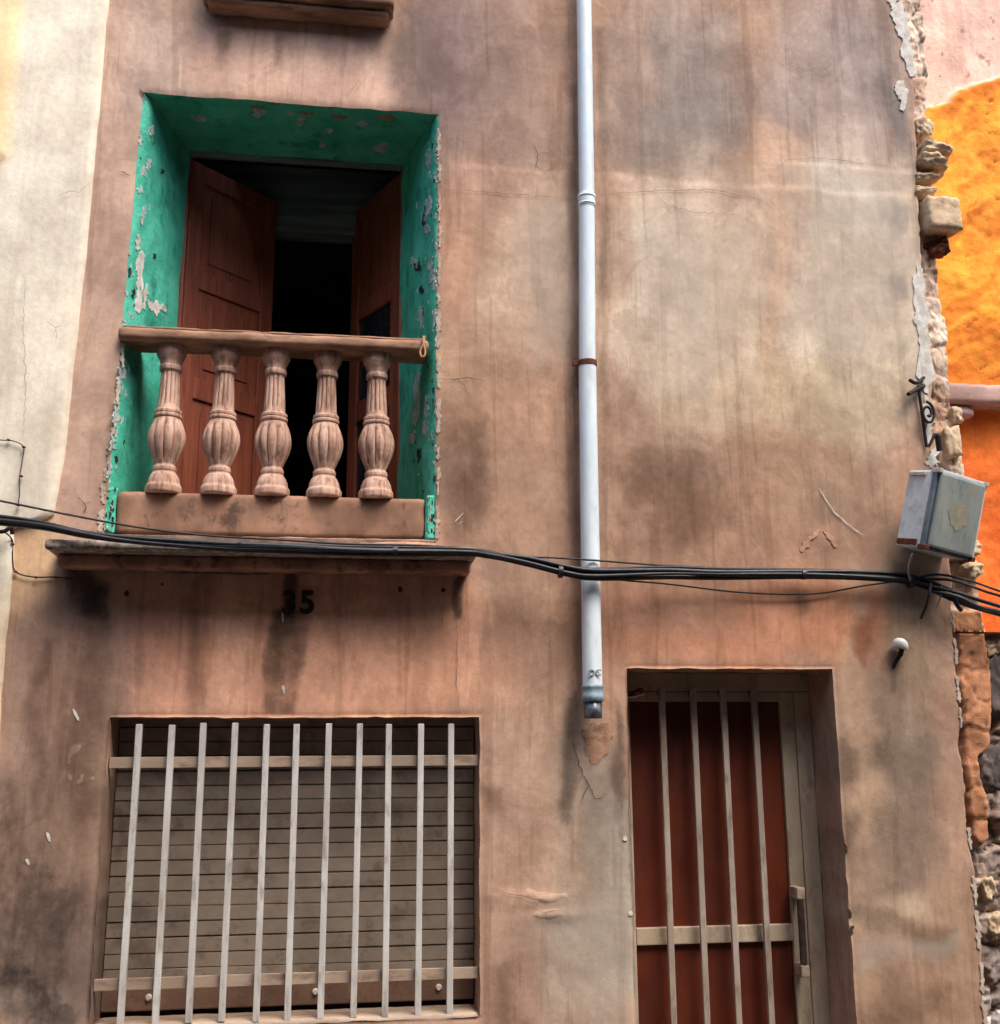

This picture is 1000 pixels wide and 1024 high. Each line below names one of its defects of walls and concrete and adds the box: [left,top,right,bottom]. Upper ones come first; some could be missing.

spalling [887,0,915,113]
peeling [122,125,167,326]
crack [604,188,771,214]
peeling [97,343,138,533]
peeling [408,128,443,539]
spalling [912,266,940,468]
water stain [266,573,299,679]
spalling [582,722,614,764]
crack [572,742,632,902]